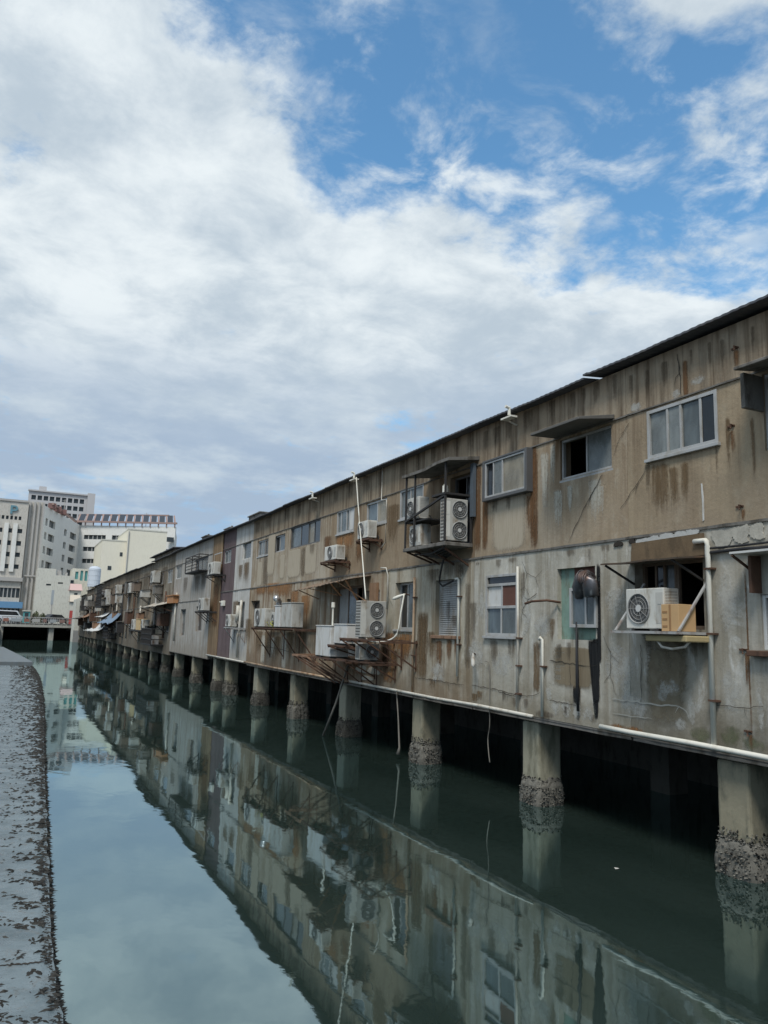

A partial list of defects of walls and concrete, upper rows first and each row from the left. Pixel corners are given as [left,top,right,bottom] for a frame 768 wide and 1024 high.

rust [526,447,538,546]
spalling [613,484,765,547]
rust [380,614,435,682]